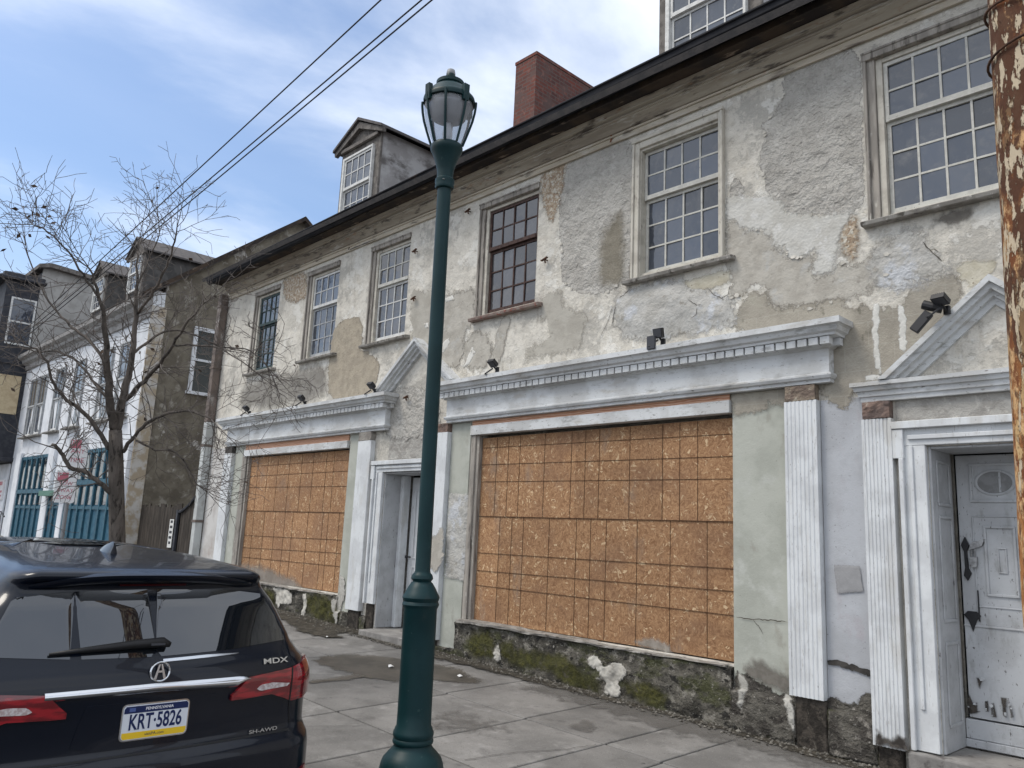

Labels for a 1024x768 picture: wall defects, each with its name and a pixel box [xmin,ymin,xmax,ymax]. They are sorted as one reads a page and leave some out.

flaking render [525,139,632,362]
flaking render [328,317,379,398]
flaking render [685,178,963,410]
leakage [865,303,882,380]
leakage [898,304,908,351]
flaking render [729,670,797,741]